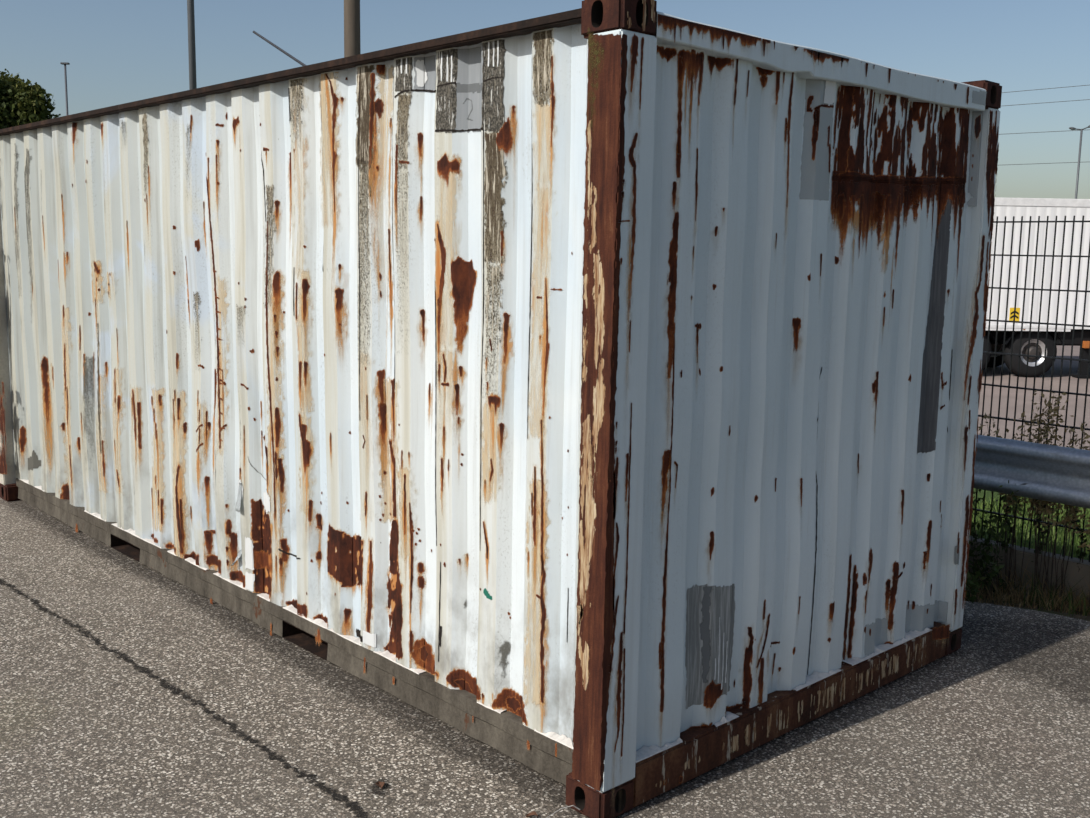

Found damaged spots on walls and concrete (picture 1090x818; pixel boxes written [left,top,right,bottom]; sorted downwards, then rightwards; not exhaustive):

rust [41,343,82,500]
rust [79,326,328,643]
rust [325,73,347,345]
rust [299,361,528,726]
peeling [395,49,458,133]
crack [434,294,442,662]
rust [419,221,477,427]
peeling [481,39,506,133]
rust [527,278,562,730]
rust [562,33,644,791]
rust [657,14,794,712]
rust [794,46,999,644]